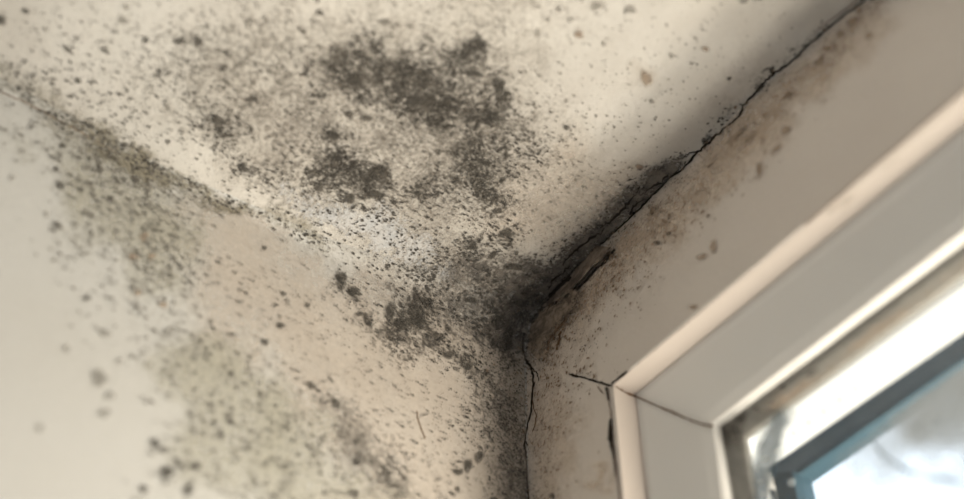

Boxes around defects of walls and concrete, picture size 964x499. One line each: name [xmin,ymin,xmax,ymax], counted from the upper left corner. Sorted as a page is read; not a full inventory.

crack [522,0,866,499]
leakage [149,435,174,456]
leakage [721,407,760,444]
leakage [751,400,789,499]